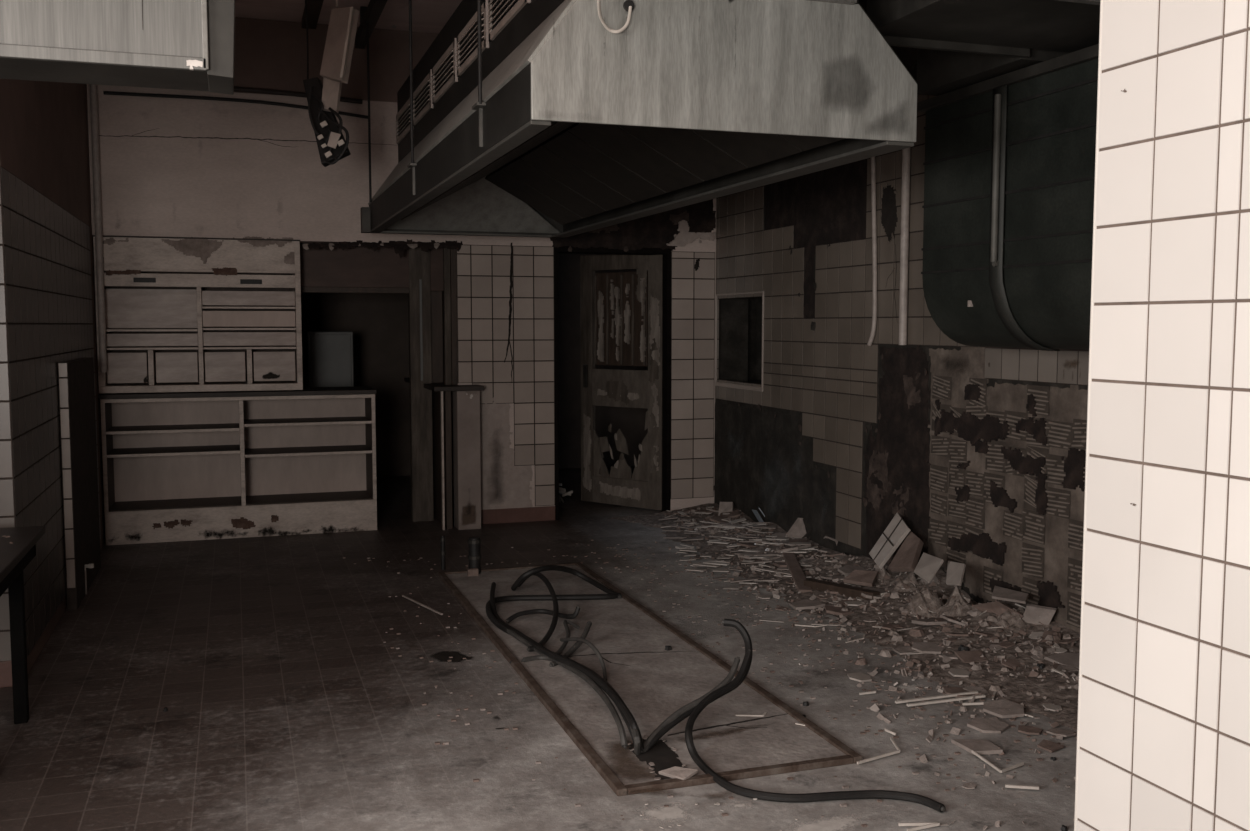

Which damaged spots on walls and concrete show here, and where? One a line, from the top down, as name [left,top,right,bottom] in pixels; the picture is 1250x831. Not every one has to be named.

peeling [714,402,838,551]
spalling [863,345,990,569]
spalling [1022,604,1057,625]